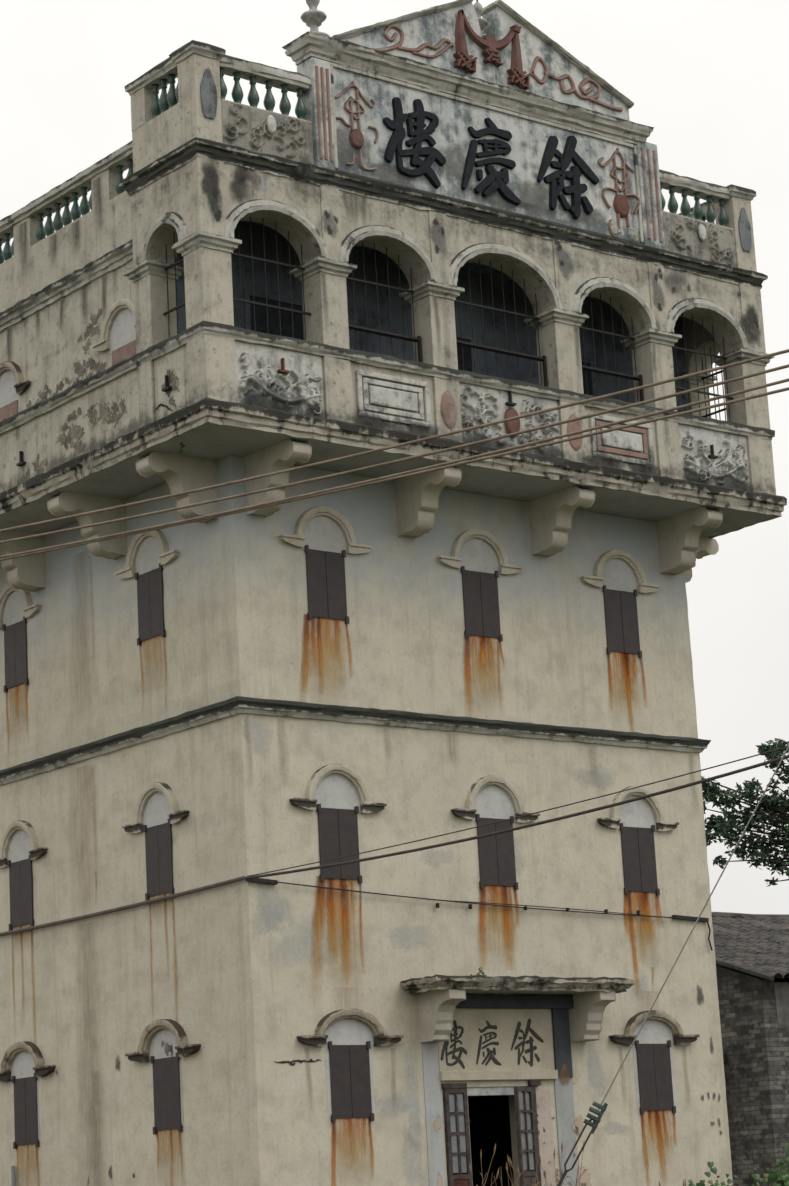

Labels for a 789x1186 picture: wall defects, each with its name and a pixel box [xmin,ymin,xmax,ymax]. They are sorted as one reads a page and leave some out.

rust [6,683,27,733]
rust [303,614,352,681]
rust [465,635,504,702]
rust [607,652,646,722]
rust [314,876,363,970]
rust [480,885,519,949]
rust [624,891,660,974]
crack [274,1058,321,1066]
rust [157,1129,182,1168]
rust [332,1117,373,1186]
rust [641,1110,676,1170]